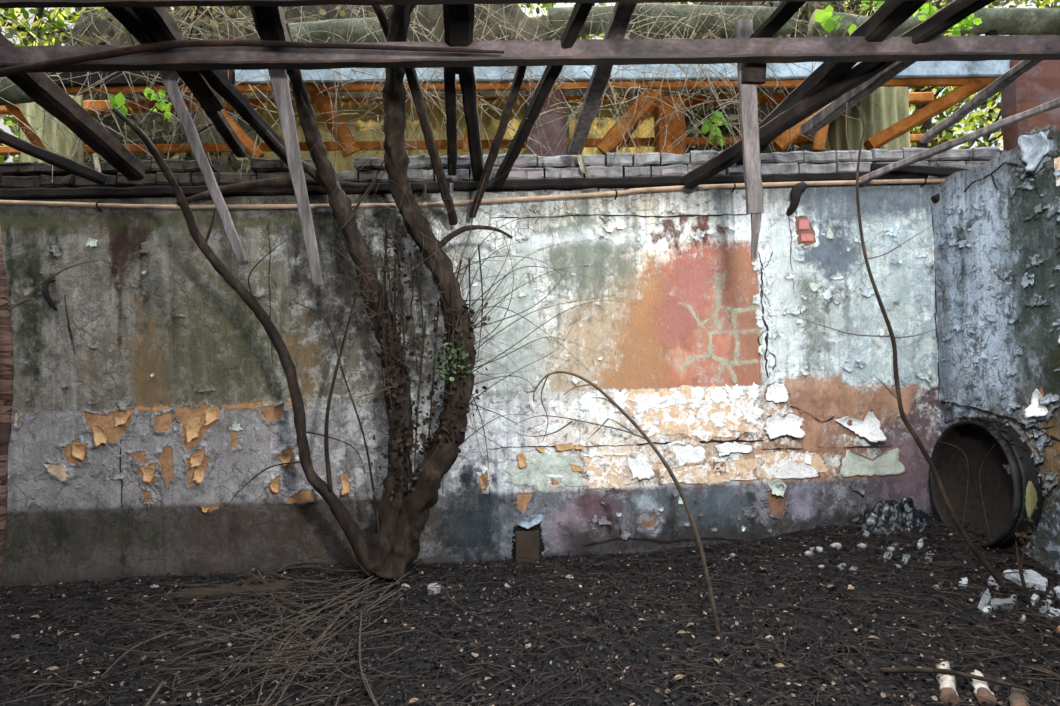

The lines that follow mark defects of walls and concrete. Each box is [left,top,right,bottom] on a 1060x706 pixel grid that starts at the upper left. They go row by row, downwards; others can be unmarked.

corrosion [549,213,762,391]
crack [680,207,794,383]
flaking render [782,210,875,324]
peeling [940,228,972,248]
spalling [972,125,1060,335]
spalling [42,383,292,509]
spalling [195,491,241,515]
spalling [263,442,322,507]
spalling [336,466,356,499]
leakage [440,465,503,562]
leakage [545,485,854,556]
peeling [969,382,1060,498]